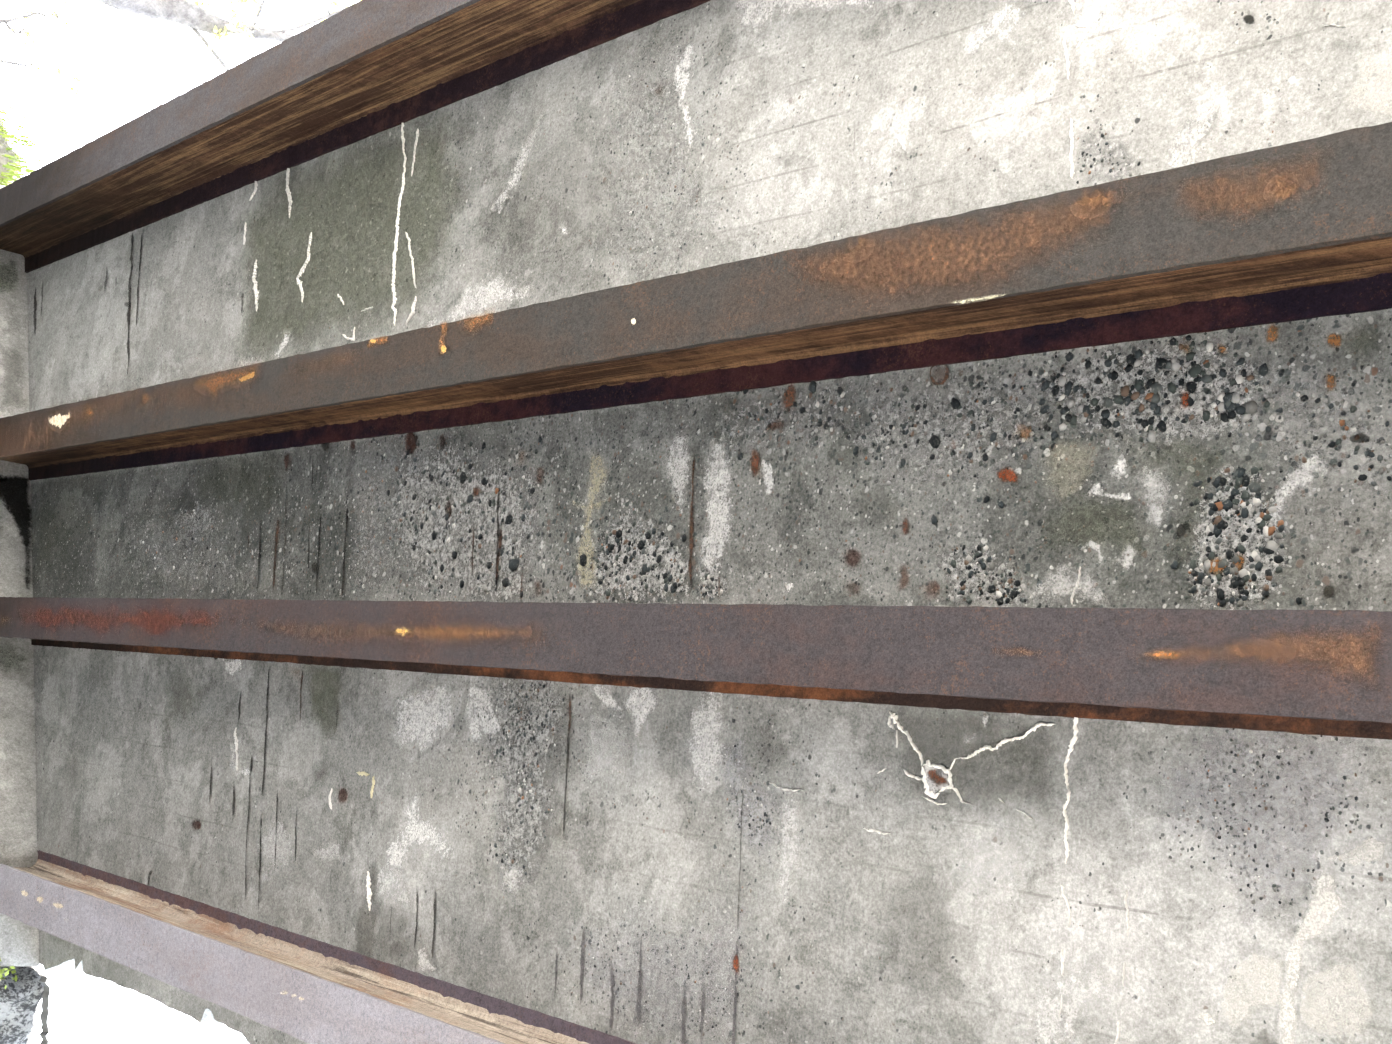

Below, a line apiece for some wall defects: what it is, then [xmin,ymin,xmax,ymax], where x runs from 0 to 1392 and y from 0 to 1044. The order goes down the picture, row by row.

crack [1068,118,1076,179]
crack [243,168,312,311]
crack [337,123,419,341]
corrosion [810,201,1108,291]
corrosion [202,369,255,396]
corrosion [1150,649,1209,658]
corrosion [1234,636,1371,674]
crack [877,710,1079,1021]
leakage [1198,837,1384,1044]